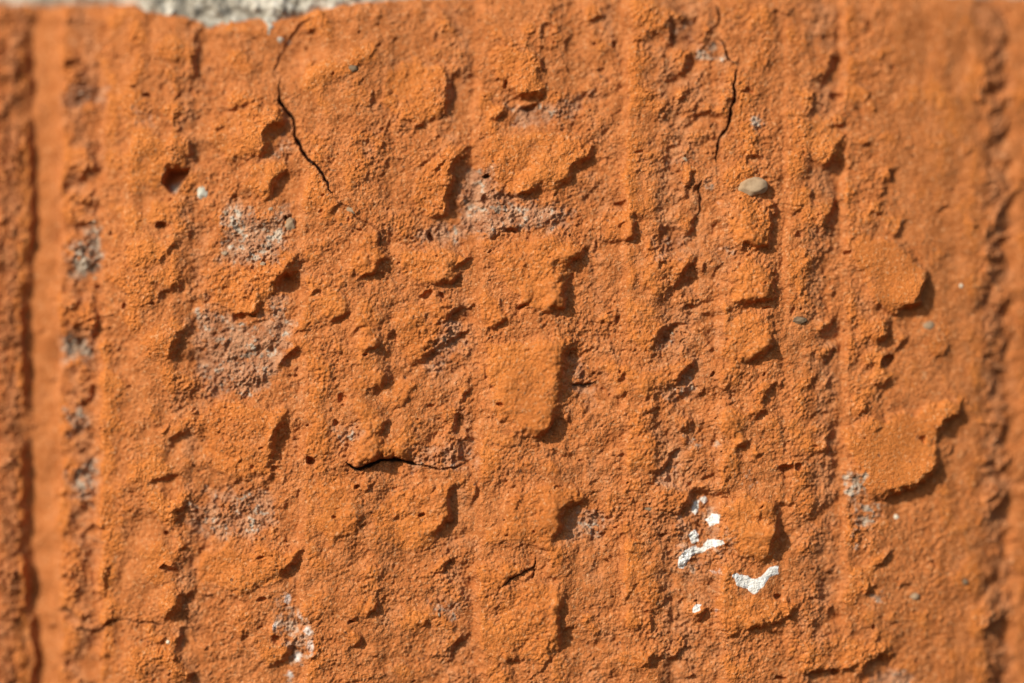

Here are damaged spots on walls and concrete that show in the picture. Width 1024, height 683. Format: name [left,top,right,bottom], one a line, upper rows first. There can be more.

crack [273,15,391,255]
crack [696,6,738,218]
crack [346,456,470,473]